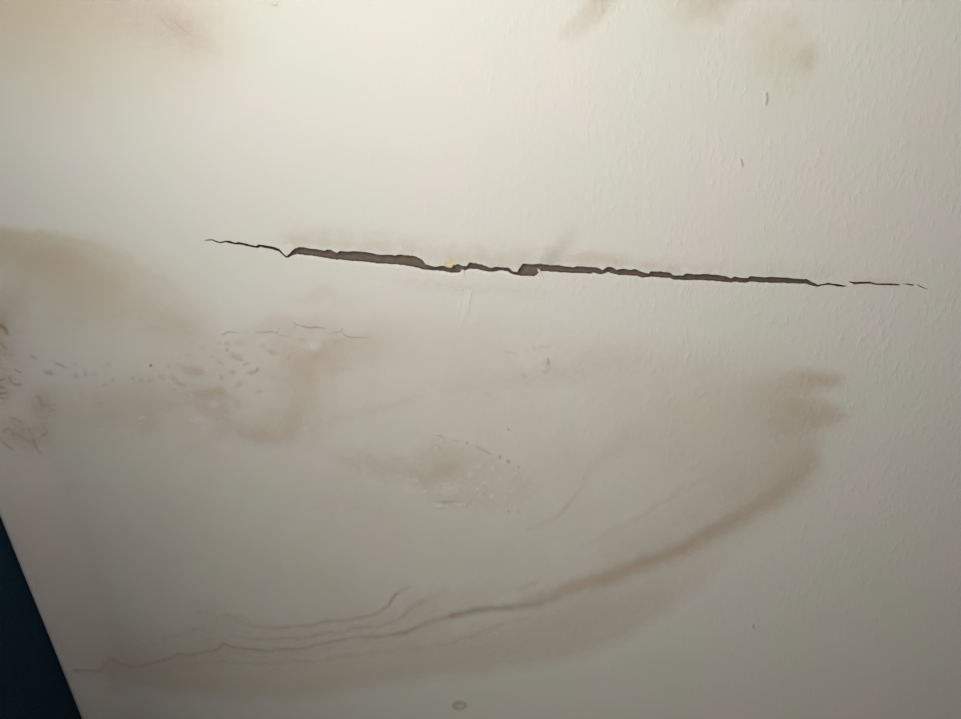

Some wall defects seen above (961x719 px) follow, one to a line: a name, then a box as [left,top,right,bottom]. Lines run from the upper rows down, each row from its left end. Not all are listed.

leakage [0,233,123,305]
crack [207,236,926,289]
leakage [558,400,835,592]